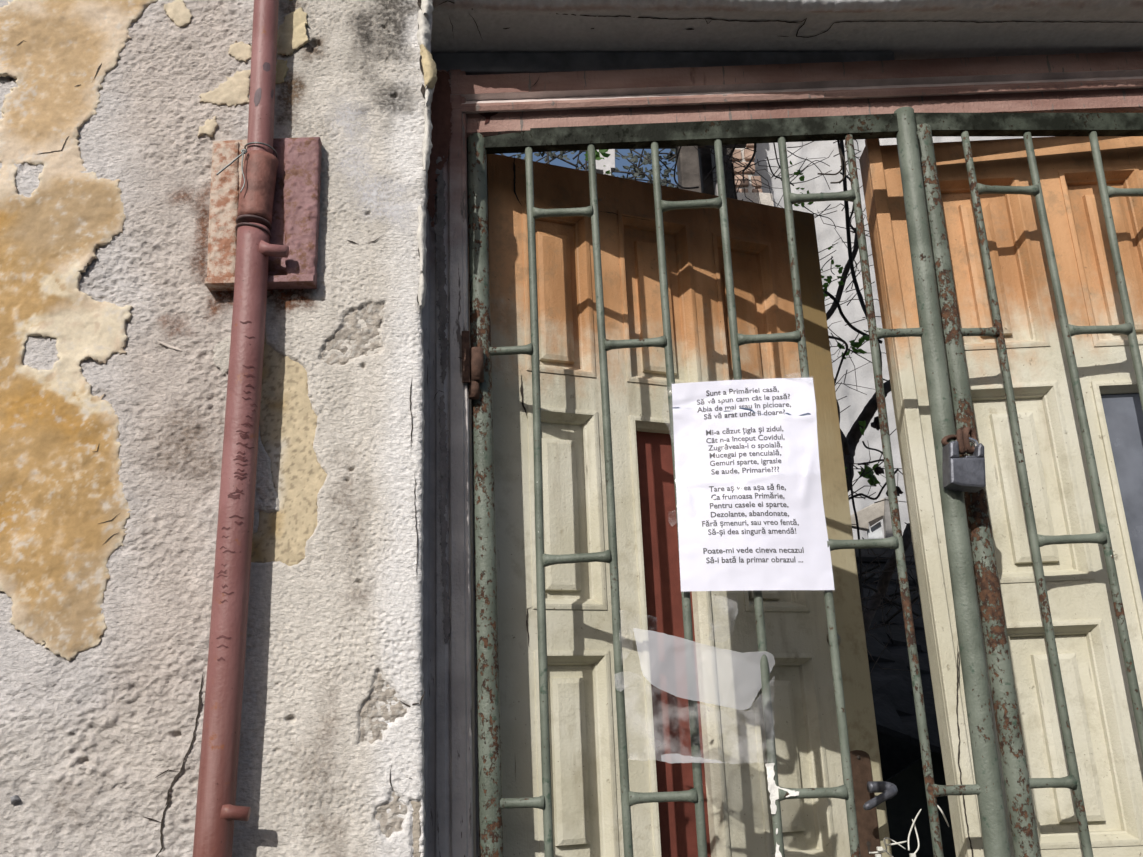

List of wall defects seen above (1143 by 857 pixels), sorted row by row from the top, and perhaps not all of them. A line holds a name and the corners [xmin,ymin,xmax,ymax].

peeling [198,41,252,138]
peeling [276,0,309,84]
peeling [0,0,193,661]
spalling [251,335,327,566]
crack [145,675,203,857]
spalling [360,673,407,744]